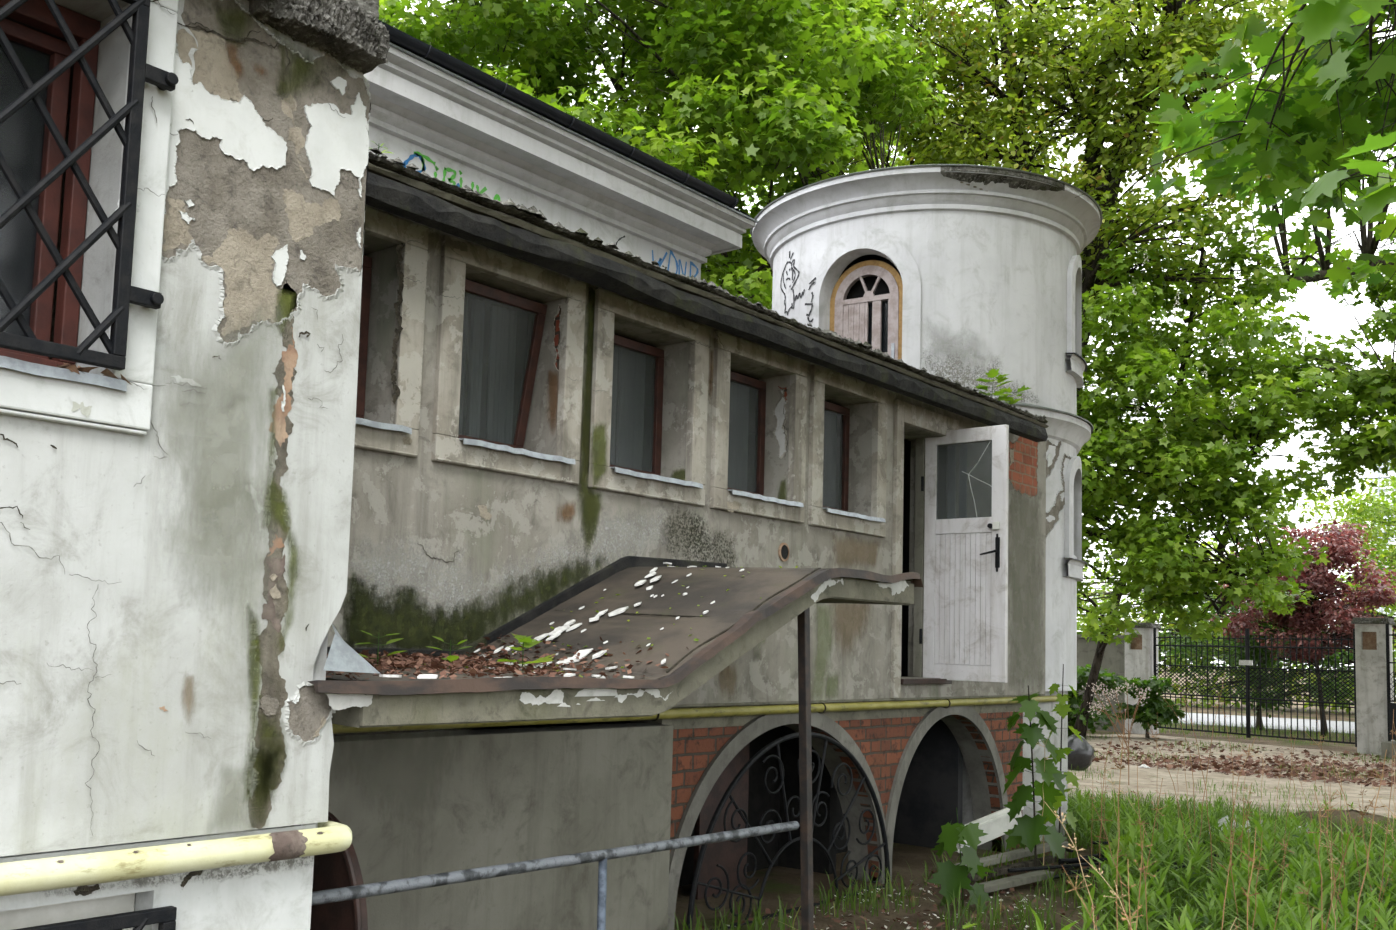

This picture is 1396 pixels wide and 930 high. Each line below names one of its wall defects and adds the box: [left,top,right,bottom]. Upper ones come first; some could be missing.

peeling [161,0,390,829]
leakage [583,288,595,473]
crack [0,506,118,835]
leakage [219,613,286,826]
leakage [349,492,735,650]
peeling [520,676,673,707]